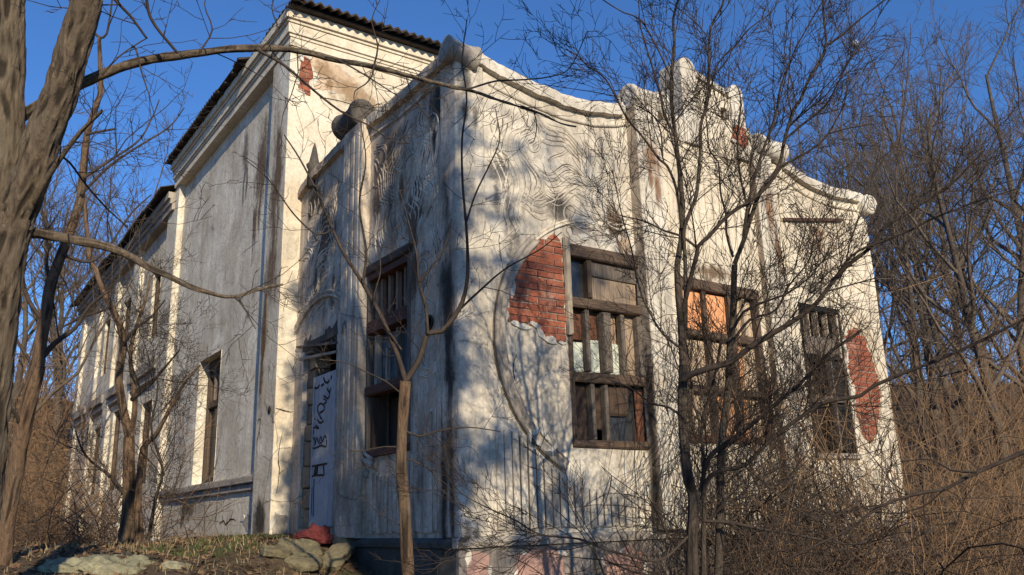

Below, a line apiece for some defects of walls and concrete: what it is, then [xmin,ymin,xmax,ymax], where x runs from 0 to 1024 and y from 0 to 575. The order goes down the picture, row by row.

flaking render [296,54,354,96]
flaking render [731,122,751,155]
damp [242,119,283,404]
flaking render [502,216,635,345]
flaking render [842,328,881,443]